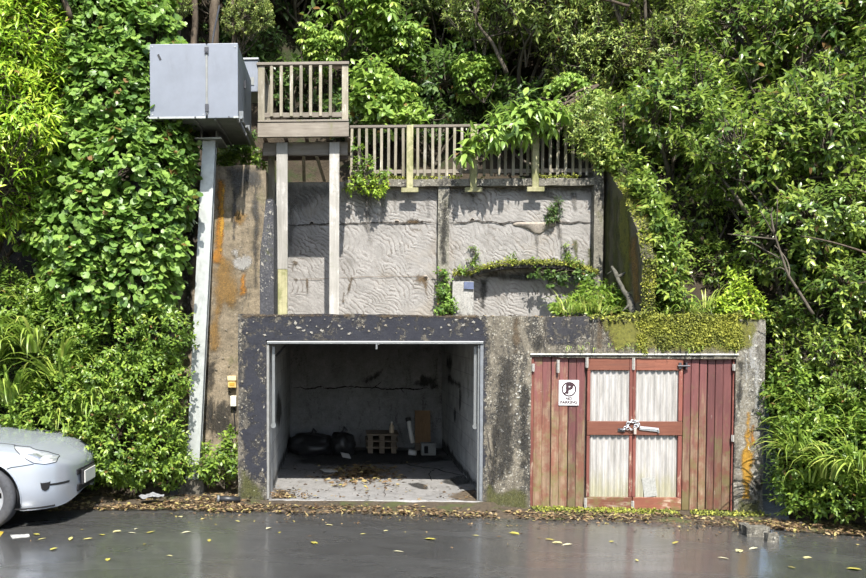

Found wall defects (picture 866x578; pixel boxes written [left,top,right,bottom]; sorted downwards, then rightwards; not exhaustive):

rust [209,180,246,350]
crack [288,219,525,233]
crack [551,221,591,237]
leakage [604,190,631,292]
crack [296,382,429,391]
leakage [490,318,530,484]
rust [742,414,755,499]